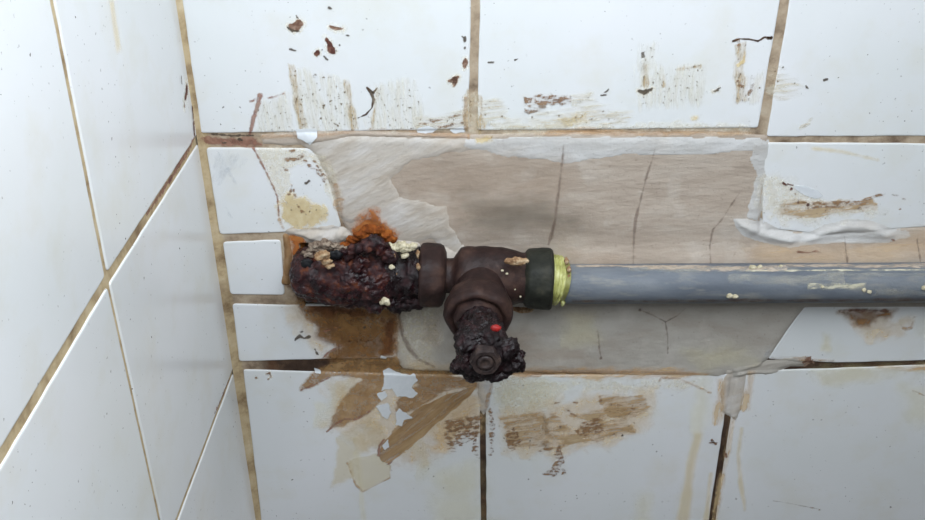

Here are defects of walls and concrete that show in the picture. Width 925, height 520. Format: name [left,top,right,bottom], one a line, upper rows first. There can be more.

water stain [278,189,342,229]
corrosion [289,235,305,255]
corrosion [314,250,335,269]
spalling [329,250,343,260]
corrosion [340,209,398,255]
corrosion [843,309,891,326]
corrosion [295,296,485,465]
peeling [376,356,418,426]
corrosion [539,445,565,477]